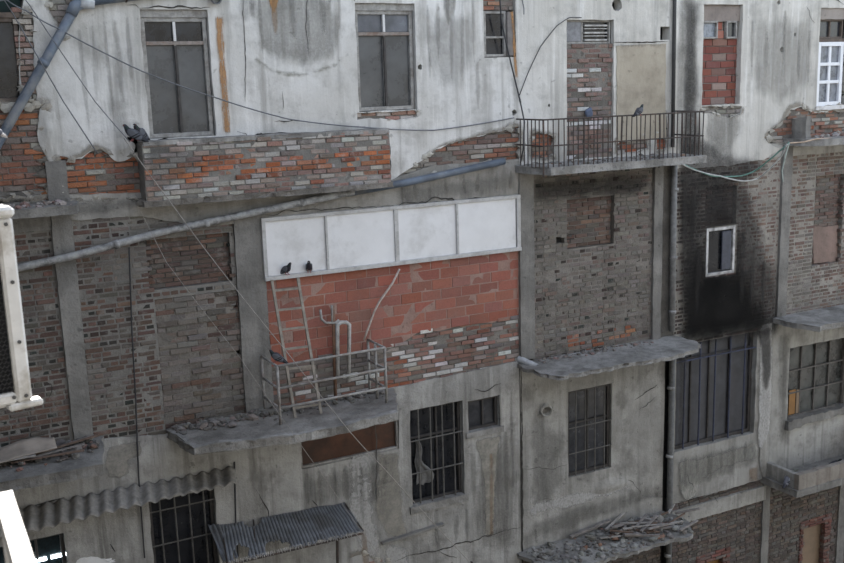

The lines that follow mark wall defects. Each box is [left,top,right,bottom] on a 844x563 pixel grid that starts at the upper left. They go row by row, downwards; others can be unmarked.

flaking render [10,7,36,91]
corrosion [216,17,230,132]
crack [240,7,248,95]
flaking render [0,89,141,203]
flaking render [396,123,556,178]
flaking render [764,102,844,147]